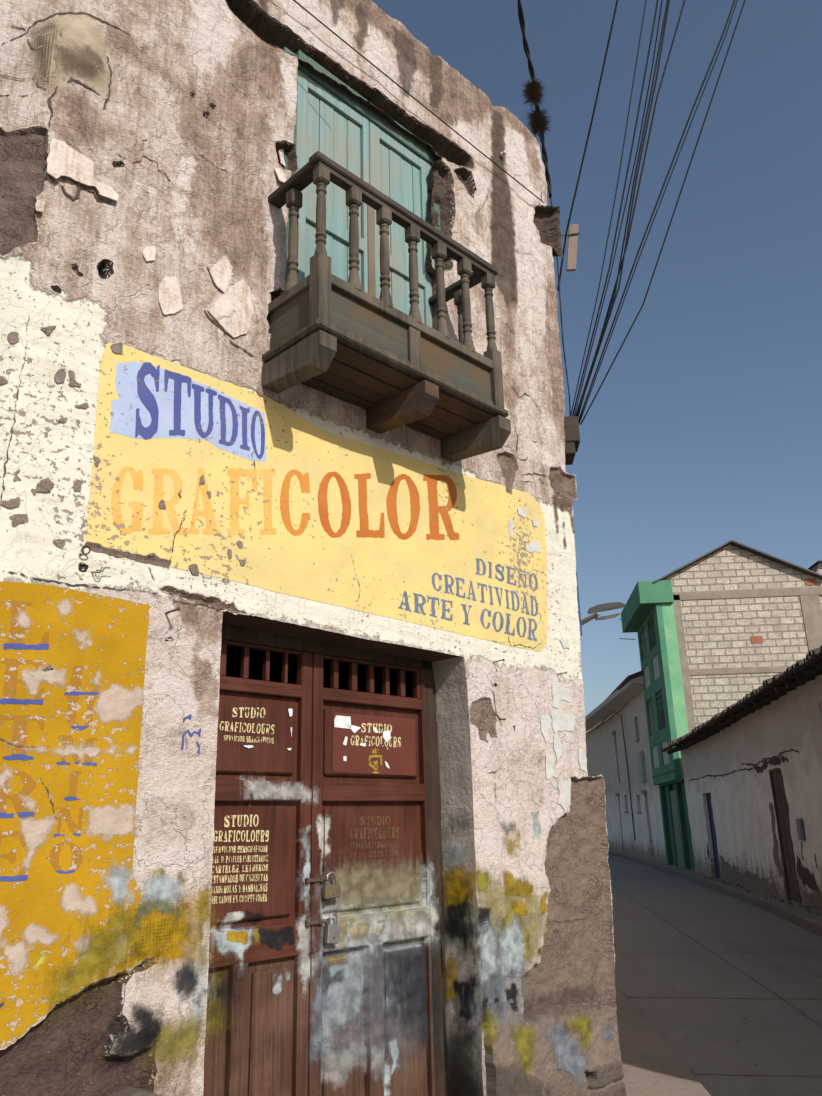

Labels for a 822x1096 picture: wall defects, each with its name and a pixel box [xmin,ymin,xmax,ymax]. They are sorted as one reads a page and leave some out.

water stain [331,0,368,47]
water stain [391,26,416,96]
flaking render [0,125,119,257]
water stain [491,111,517,305]
flaking render [207,256,253,338]
crack [0,314,30,506]
crack [8,510,223,610]
peeling [90,671,144,722]
crack [689,748,799,781]
flaking render [522,684,617,1017]
water stain [476,907,518,1023]
flaking render [0,955,160,1096]